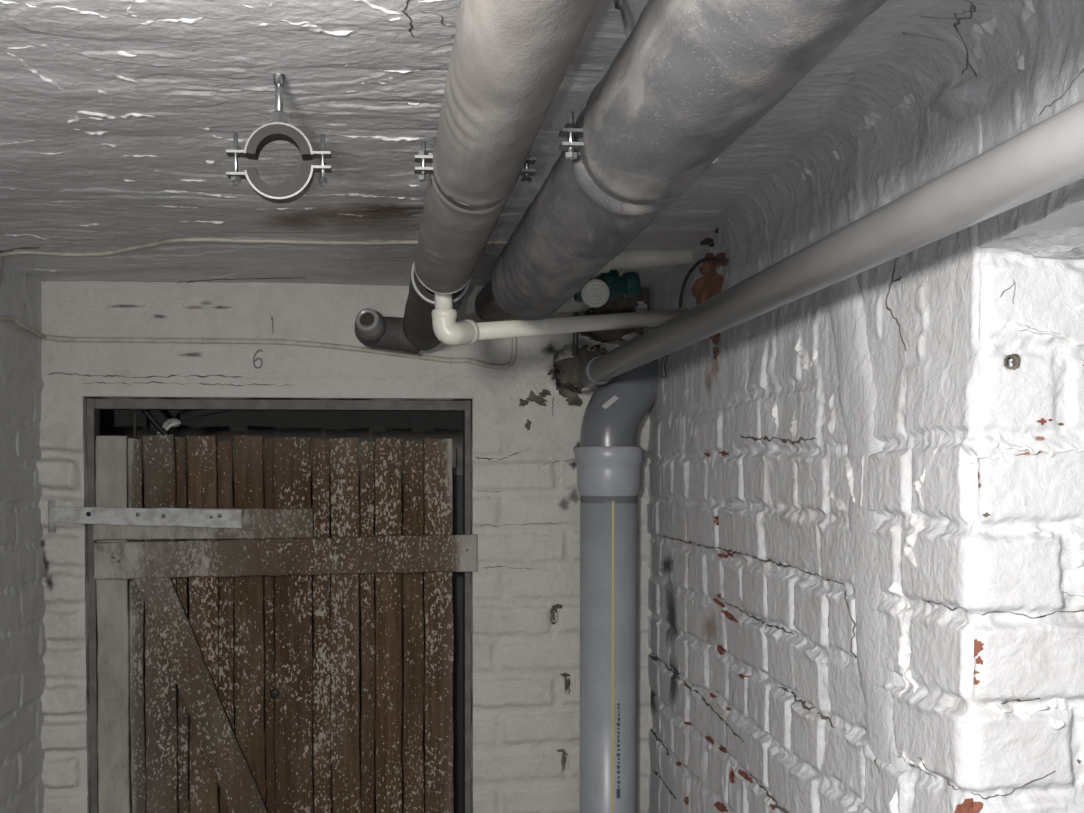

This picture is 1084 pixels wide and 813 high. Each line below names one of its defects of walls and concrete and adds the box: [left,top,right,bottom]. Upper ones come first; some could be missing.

crack [902,0,977,78]
damp [256,185,420,210]
spalling [584,288,650,316]
spalling [519,327,648,406]
crack [741,435,816,445]
damp [667,587,676,640]
crack [659,535,857,658]
damp [670,661,679,700]
crack [649,652,744,743]
peeling [974,639,984,685]
crack [745,770,789,813]
spalling [954,798,983,813]